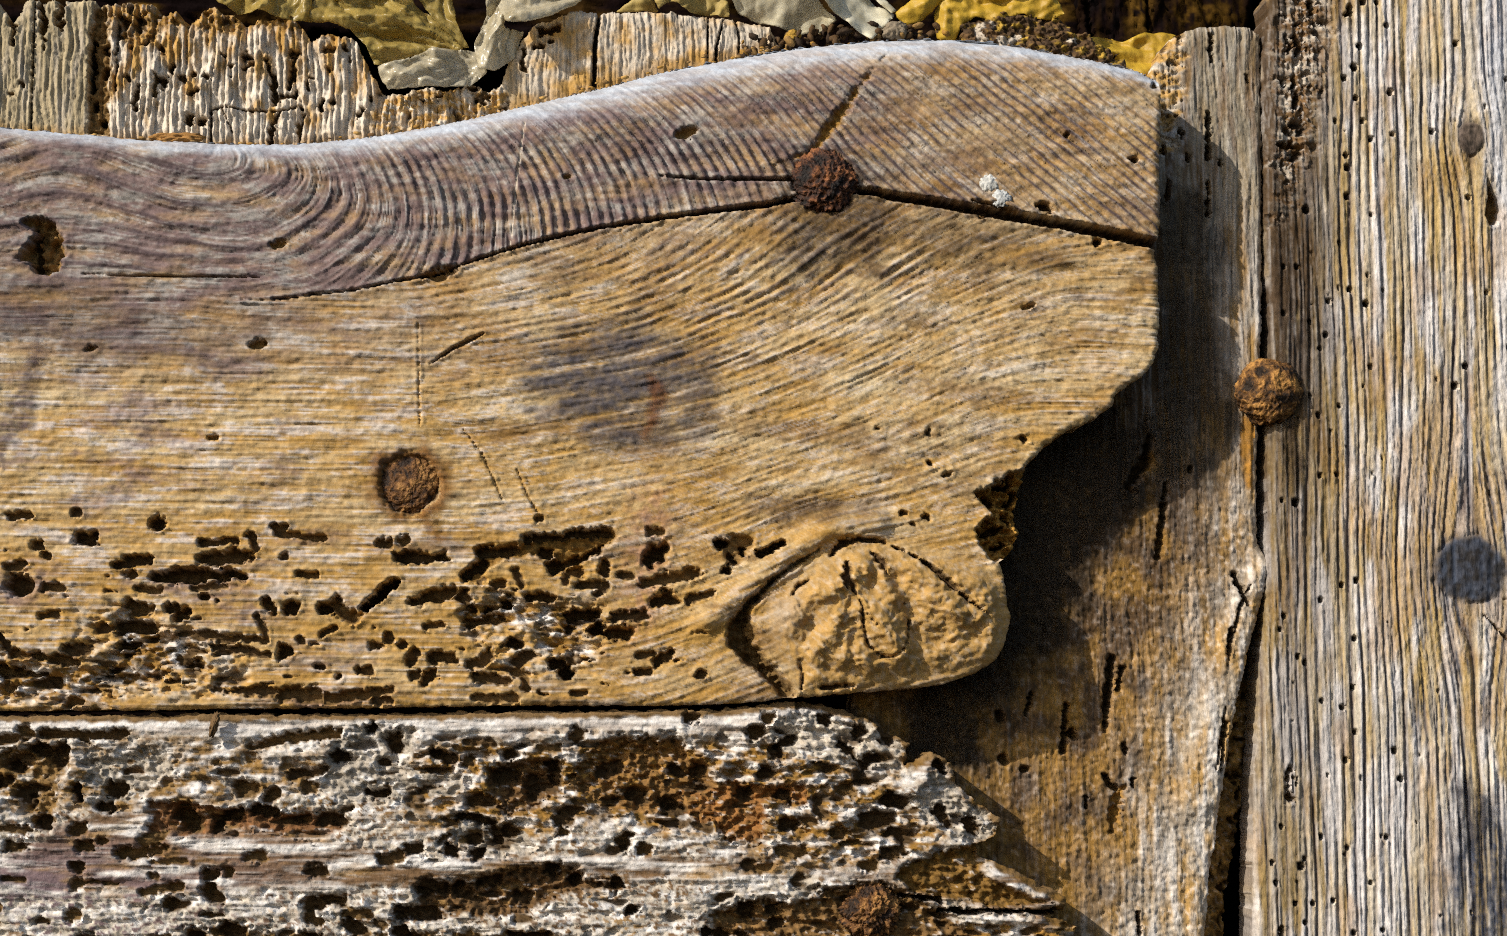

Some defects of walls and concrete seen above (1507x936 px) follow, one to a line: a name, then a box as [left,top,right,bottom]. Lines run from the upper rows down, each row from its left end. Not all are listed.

crack [82,175,795,301]
rust [780,195,896,270]
crack [854,187,1157,248]
rust [372,446,448,537]